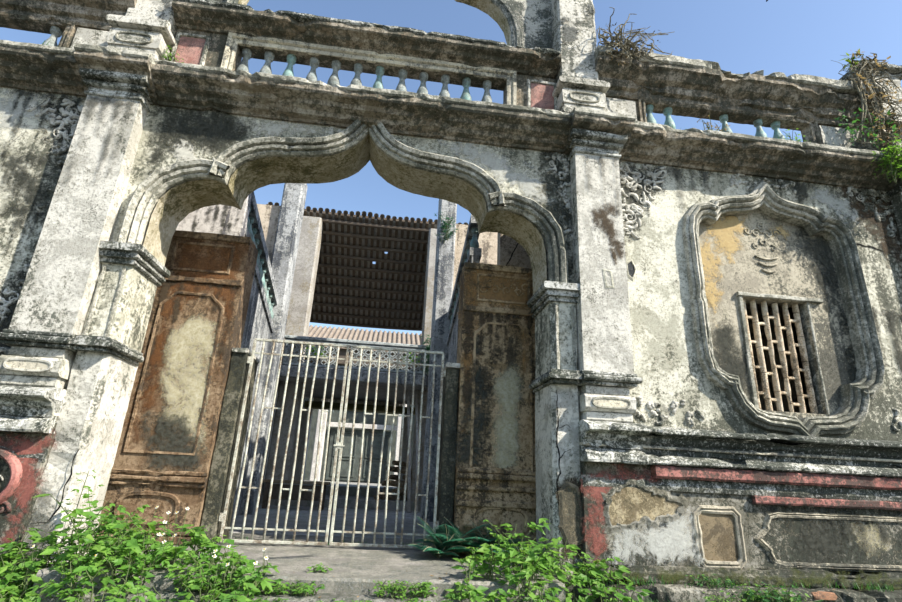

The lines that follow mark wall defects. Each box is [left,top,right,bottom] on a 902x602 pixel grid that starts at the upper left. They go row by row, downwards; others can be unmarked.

peeling [592,205,637,288]
peeling [700,216,748,313]
leakage [711,322,759,403]
crack [31,449,79,524]
crack [556,390,570,505]
spalling [558,463,689,563]